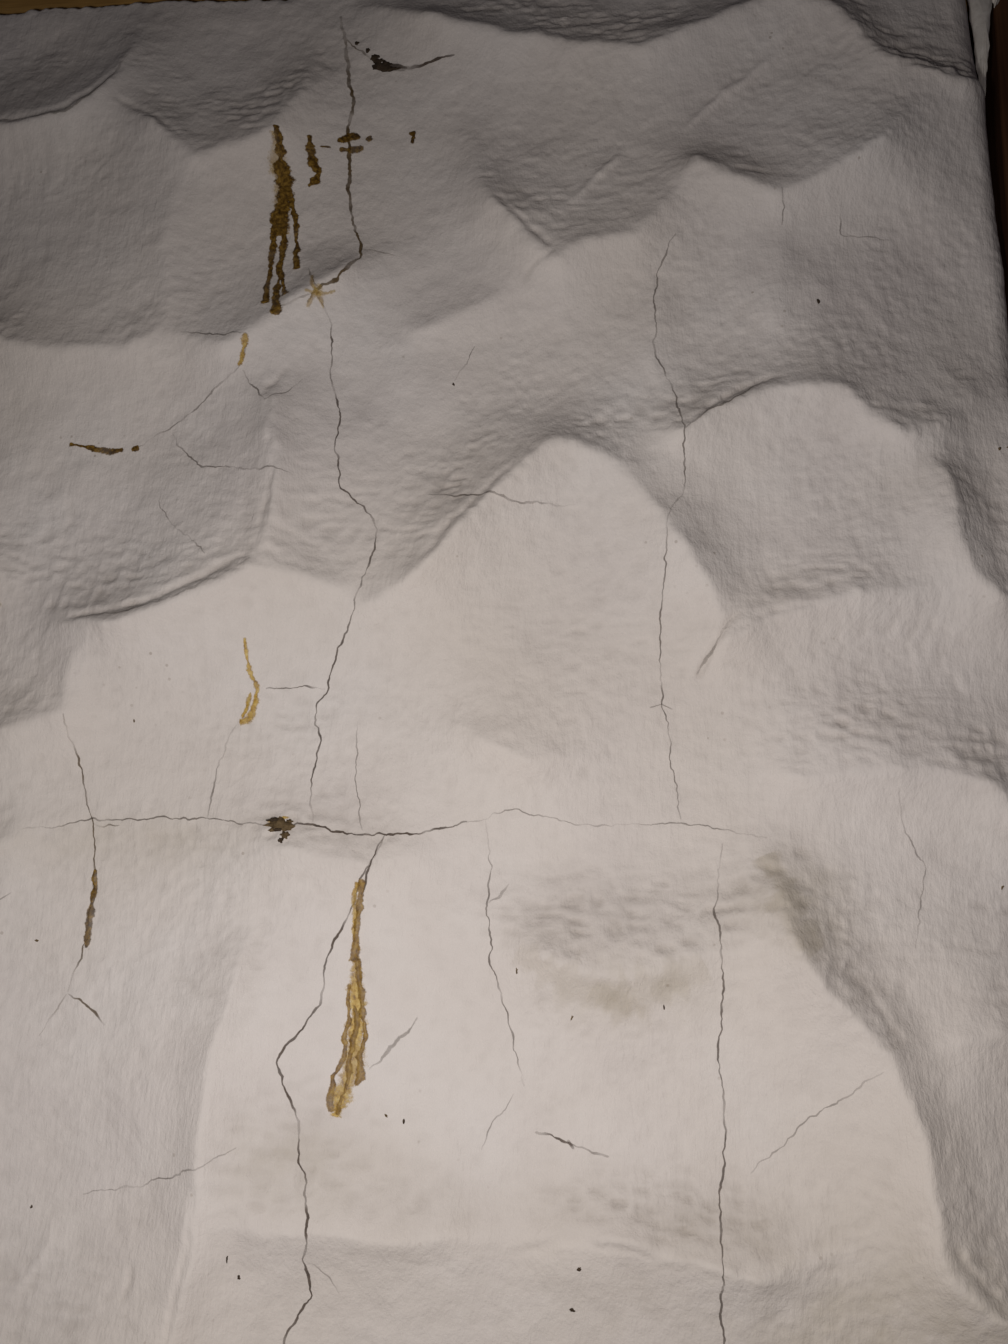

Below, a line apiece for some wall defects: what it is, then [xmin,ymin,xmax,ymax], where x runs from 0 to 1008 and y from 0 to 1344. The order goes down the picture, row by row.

corrosion [261,124,372,315]
crack [314,45,363,291]
corrosion [69,442,139,455]
crack [334,398,376,565]
corrosion [239,638,259,724]
crack [310,630,348,784]
corrosion [83,870,97,948]
crack [293,822,452,971]
crack [276,1007,318,1110]
corrosion [326,879,368,1117]
crack [285,1143,312,1336]
crack [718,1134,726,1343]